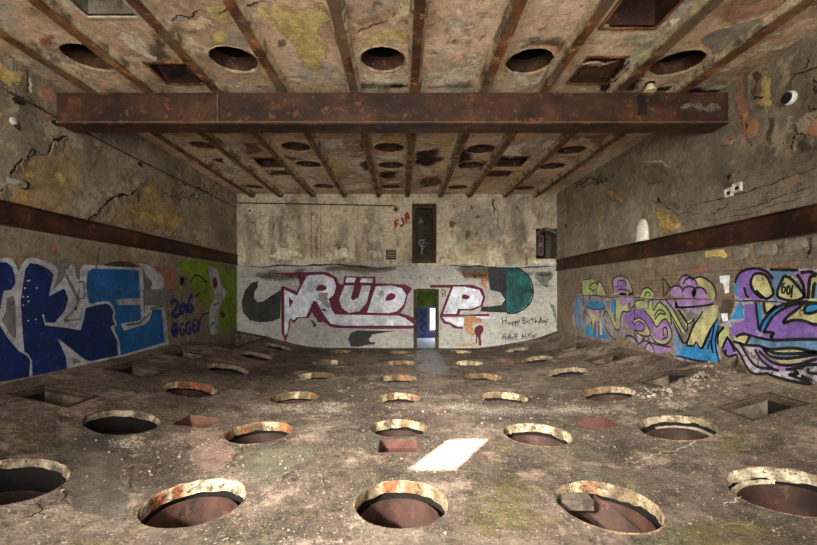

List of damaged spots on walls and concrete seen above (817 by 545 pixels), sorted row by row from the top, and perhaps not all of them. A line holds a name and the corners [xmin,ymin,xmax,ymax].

peeling [204,6,232,46]
peeling [254,4,330,72]
rust [680,103,721,112]
peeling [735,67,773,139]
peeling [790,108,817,151]
peeling [0,135,84,215]
peeling [88,176,185,232]
crack [162,182,218,201]
crack [693,168,816,223]
rust [705,249,727,258]